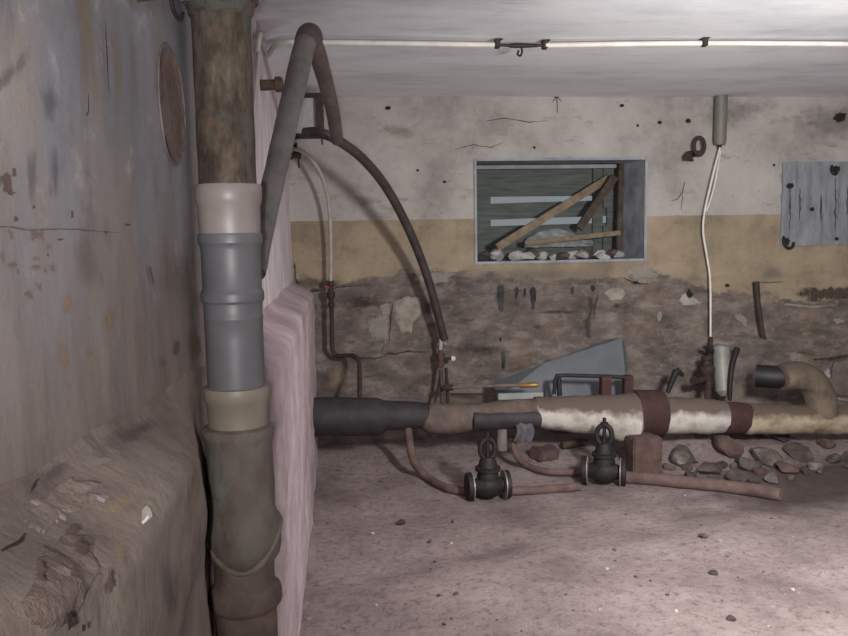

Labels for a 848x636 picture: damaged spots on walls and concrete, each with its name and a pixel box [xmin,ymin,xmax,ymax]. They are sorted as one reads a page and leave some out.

peeling [0,168,16,196]
crack [0,225,118,233]
spalling [679,289,701,306]
spalling [784,287,848,308]
flaking render [368,296,431,343]
flaking render [141,506,153,524]
spalling [21,525,114,631]